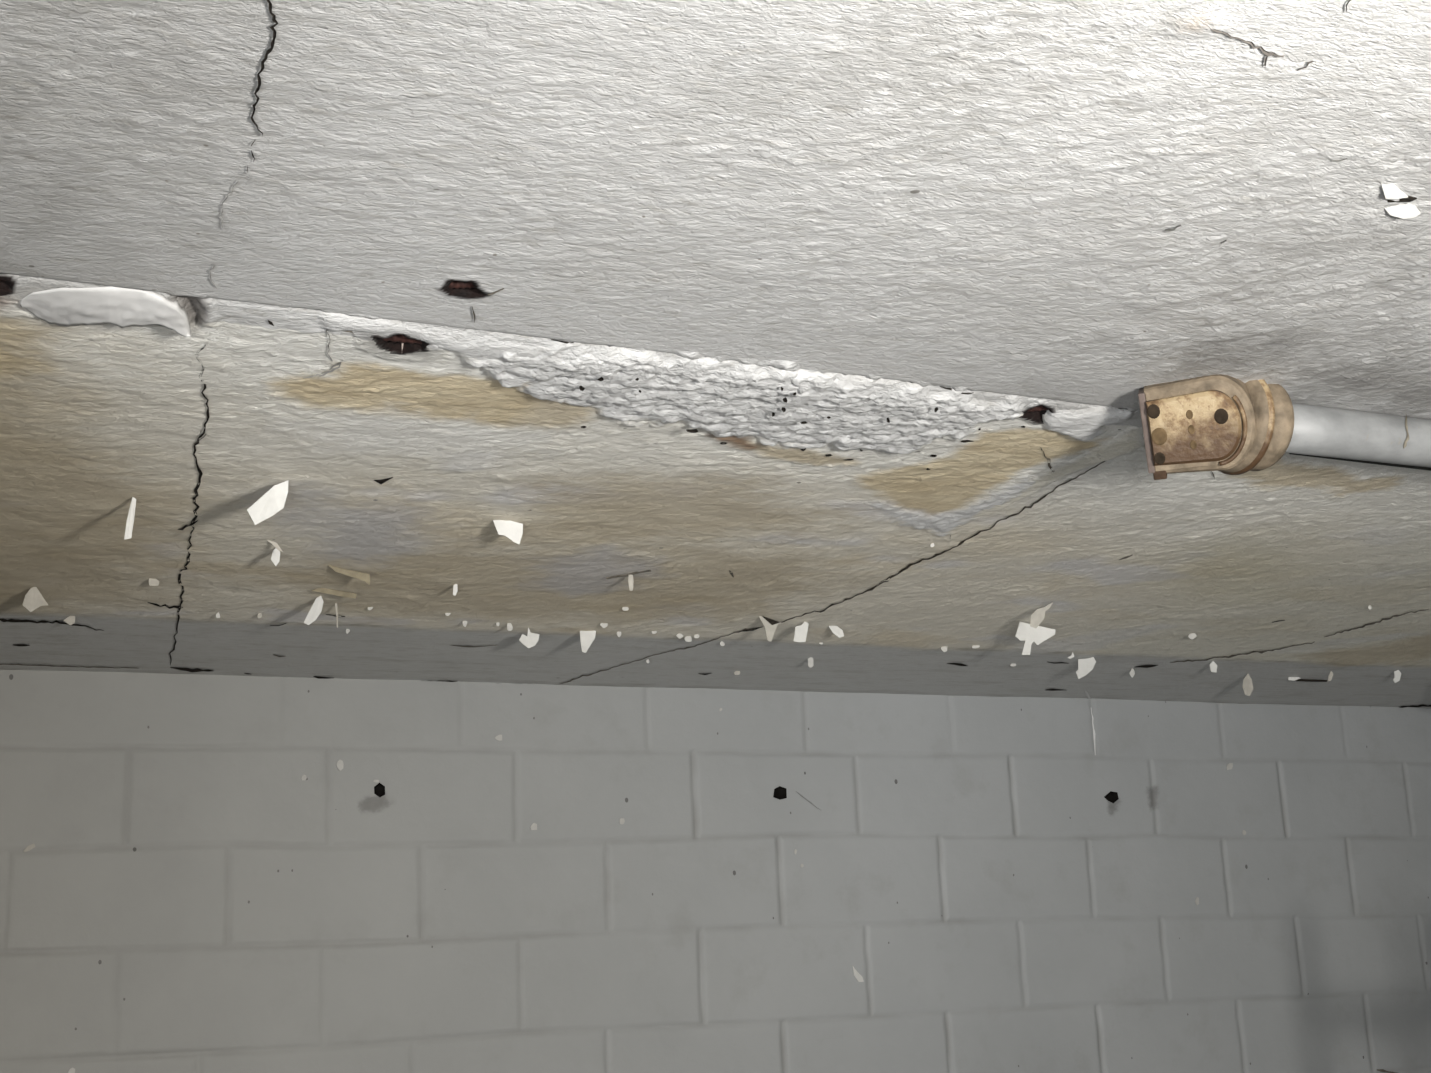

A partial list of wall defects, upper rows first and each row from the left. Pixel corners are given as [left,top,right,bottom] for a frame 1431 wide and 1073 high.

crack [219,0,278,227]
damp [0,277,1116,635]
peeling [124,497,136,540]
crack [148,345,250,674]
peeling [247,480,289,525]
peeling [493,520,523,544]
crack [560,449,1105,684]
damp [1069,506,1391,614]
crack [0,618,130,668]
peeling [759,616,844,668]
peeling [1010,602,1055,667]
damp [1278,630,1431,670]